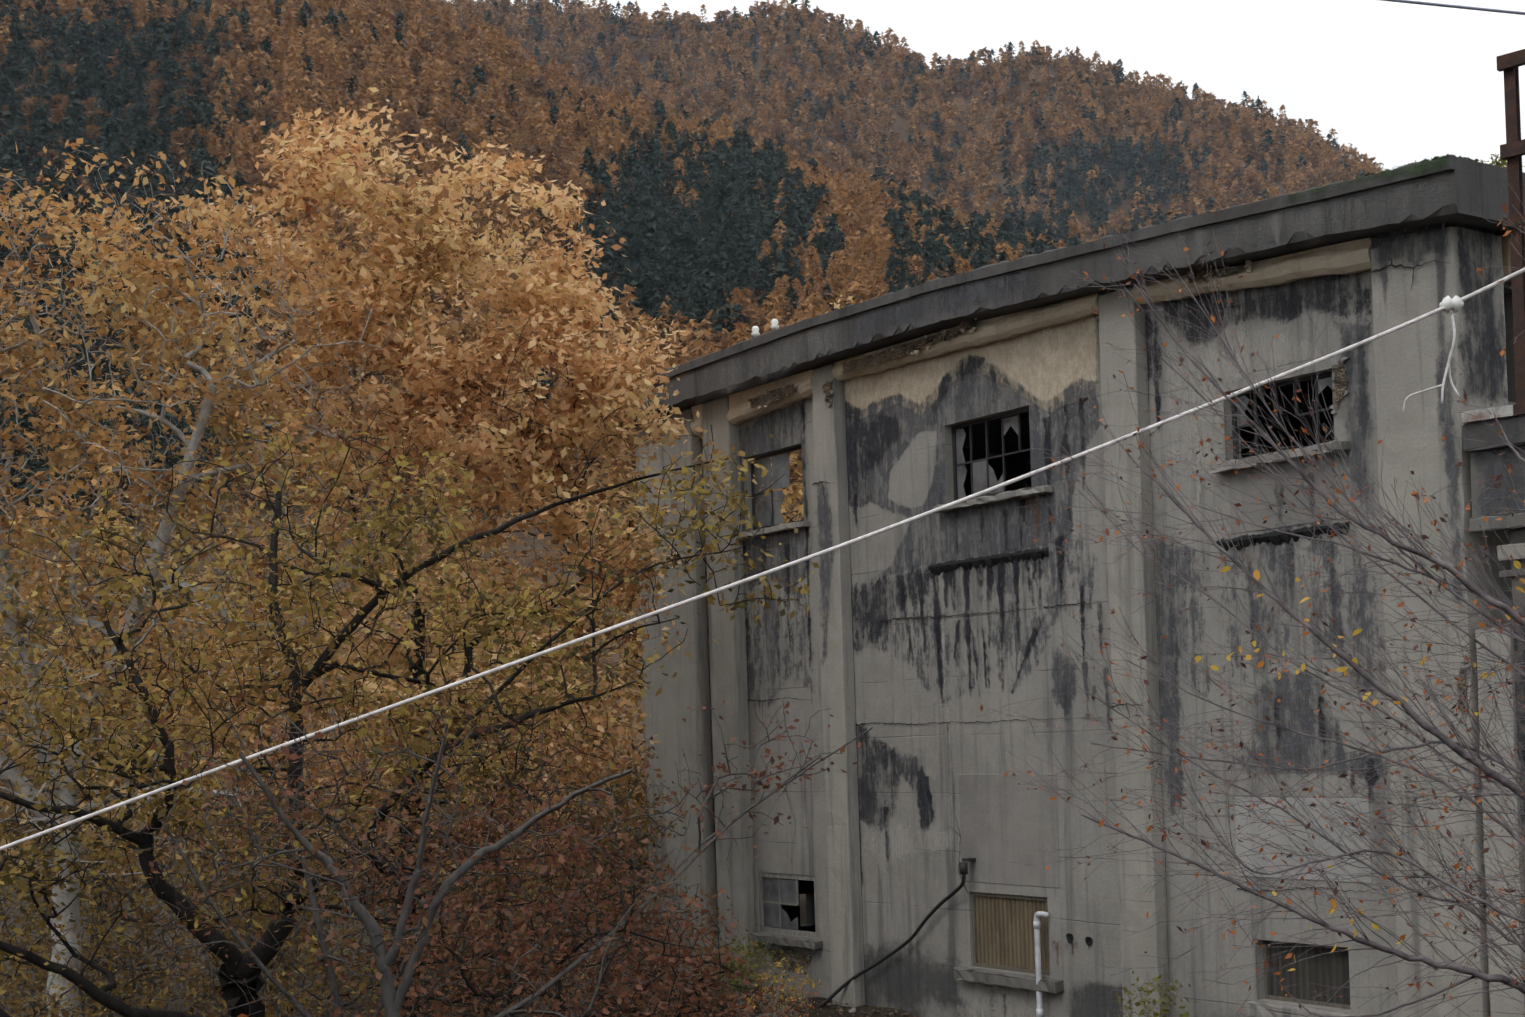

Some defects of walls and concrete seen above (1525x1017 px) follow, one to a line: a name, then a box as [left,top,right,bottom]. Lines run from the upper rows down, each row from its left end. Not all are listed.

leakage [739,403,833,707]
leakage [845,355,1111,765]
leakage [1145,222,1525,602]
leakage [856,725,949,885]